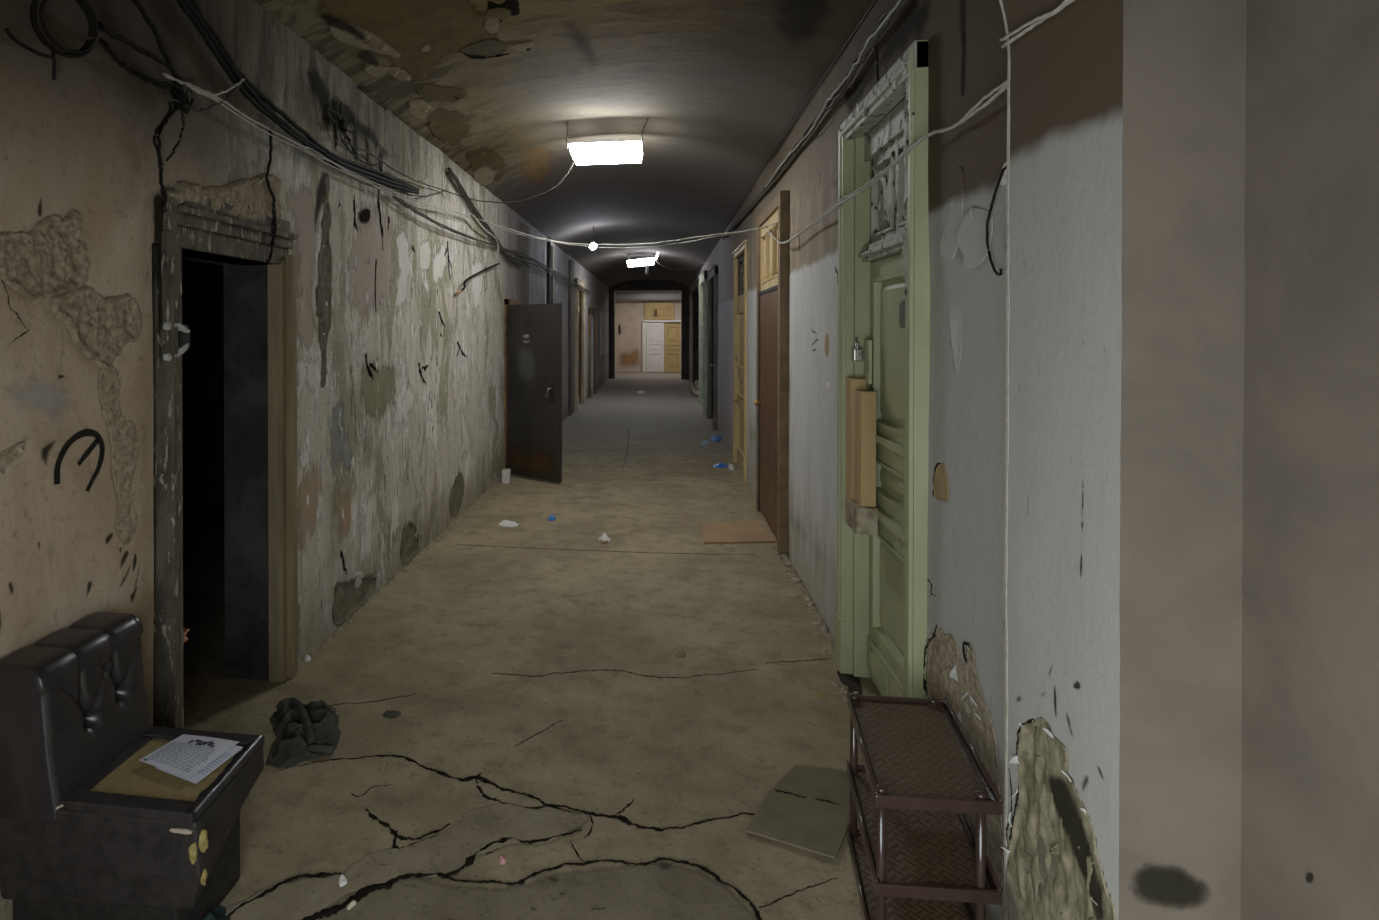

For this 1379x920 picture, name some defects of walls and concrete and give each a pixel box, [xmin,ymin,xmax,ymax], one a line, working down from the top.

peeling [330,20,507,186]
spalling [0,209,142,369]
spalling [165,173,446,403]
peeling [471,259,492,345]
spalling [0,441,26,475]
spalling [298,324,463,625]
spalling [448,456,469,518]
crack [492,658,833,679]
crack [227,754,838,920]
spalling [923,625,1116,920]